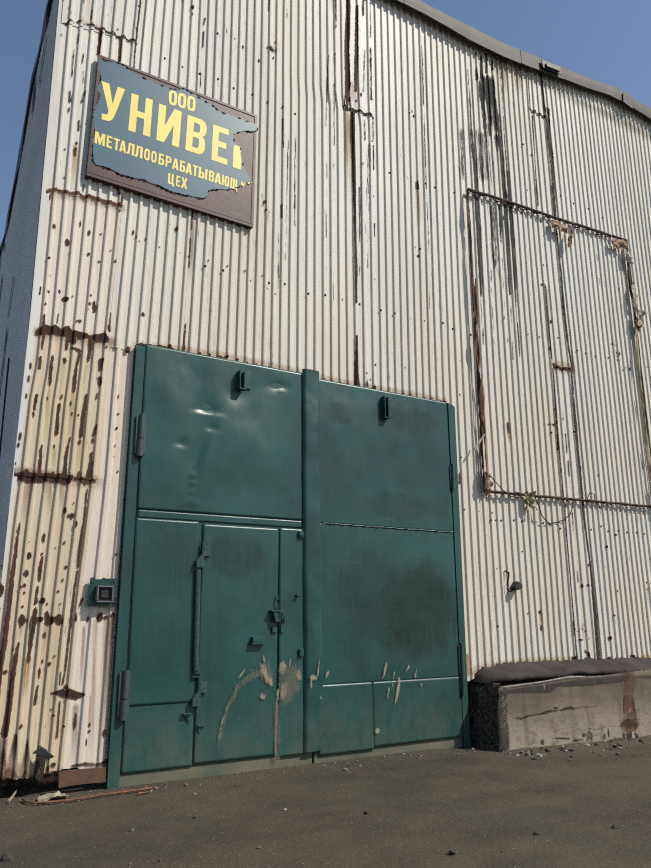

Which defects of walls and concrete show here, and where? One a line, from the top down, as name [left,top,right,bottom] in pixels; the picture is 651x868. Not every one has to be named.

corrosion [343,82,362,138]
corrosion [14,289,113,496]
corrosion [0,523,68,779]
corrosion [75,598,115,681]
corrosion [622,670,639,738]
corrosion [72,759,107,767]